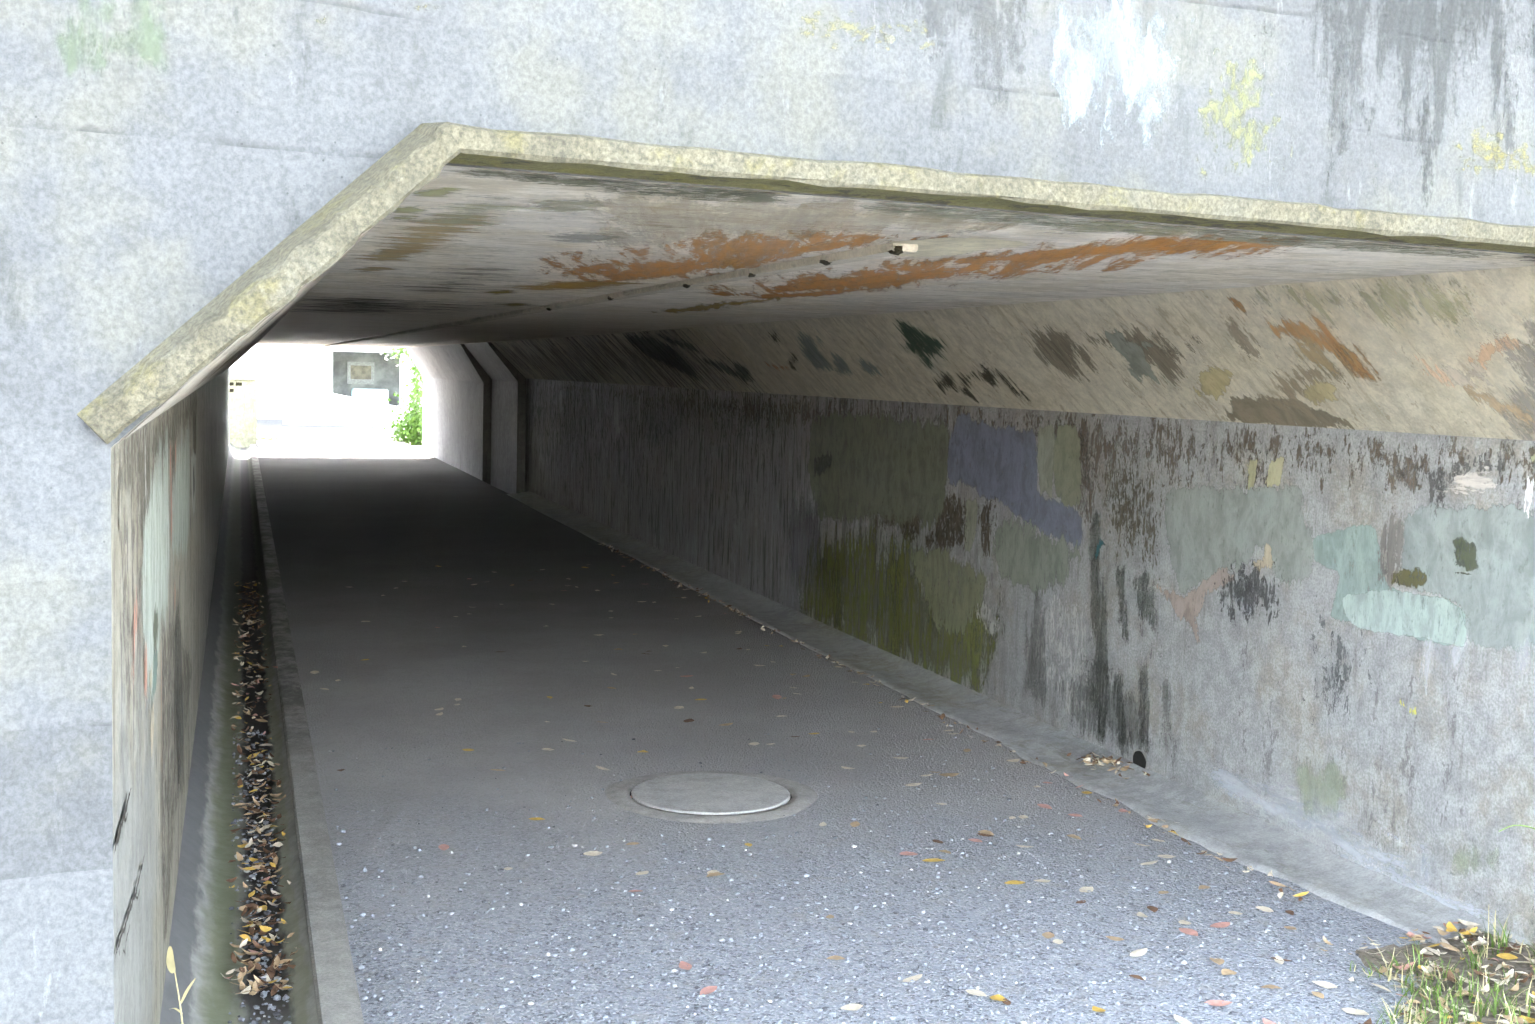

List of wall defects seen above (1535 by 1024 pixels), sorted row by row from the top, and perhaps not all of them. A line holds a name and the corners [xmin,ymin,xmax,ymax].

leakage [1314,0,1513,200]
rust [488,230,1321,313]
leakage [1073,510,1164,754]
crack [114,789,145,955]